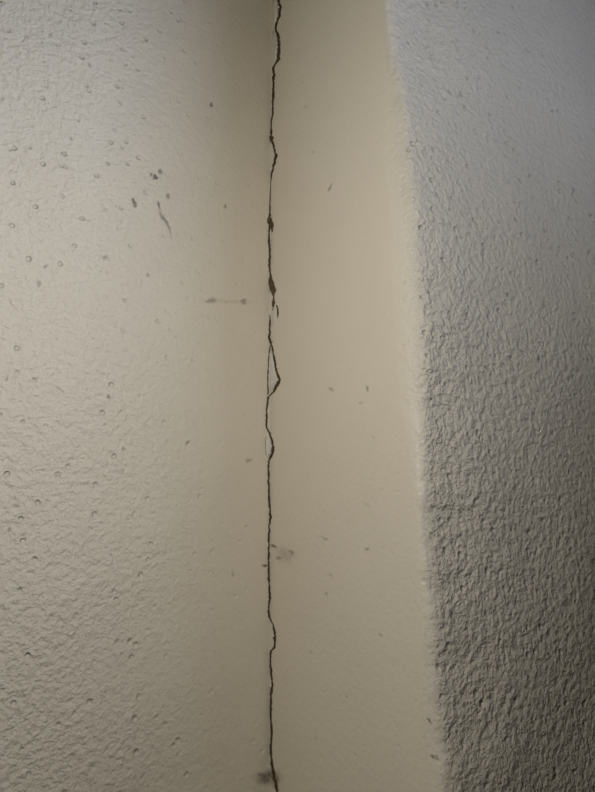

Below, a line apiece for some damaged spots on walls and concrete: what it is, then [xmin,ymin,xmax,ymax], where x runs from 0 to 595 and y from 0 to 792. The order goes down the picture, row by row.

crack [263,0,282,792]